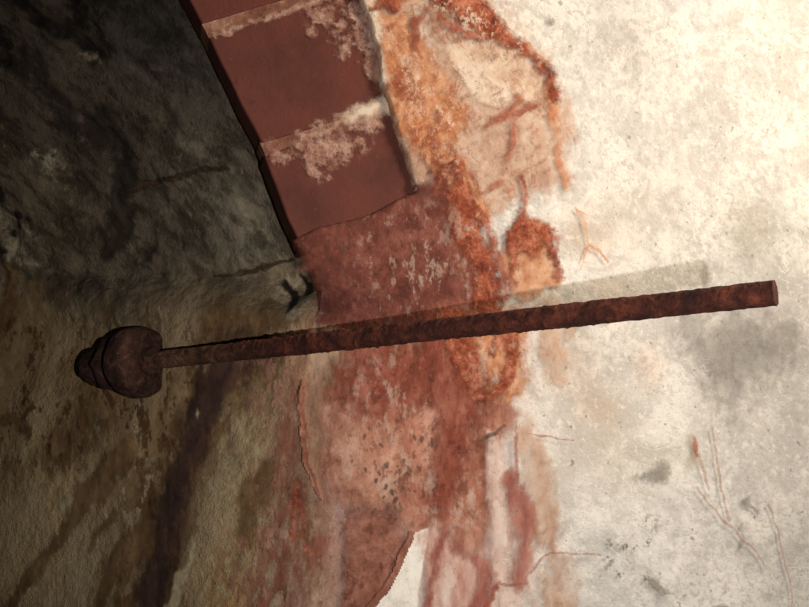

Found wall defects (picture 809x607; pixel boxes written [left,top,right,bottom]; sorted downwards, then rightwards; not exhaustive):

peeling [359,0,389,87]
water stain [80,106,141,261]
crack [129,166,230,192]
rust [364,0,574,319]
crack [576,208,608,262]
rust [444,332,528,402]
rust [540,327,575,386]
water stain [48,356,285,607]
rust [232,351,344,607]
peeling [341,459,476,607]
rust [503,425,576,607]
crack [742,497,759,514]